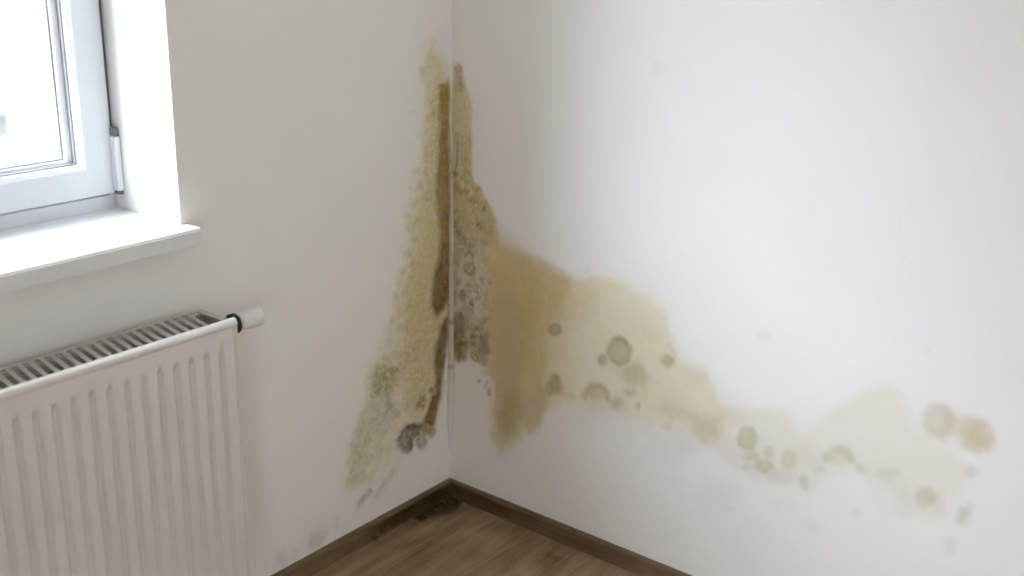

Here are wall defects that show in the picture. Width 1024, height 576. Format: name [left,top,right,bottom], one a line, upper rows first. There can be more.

damp [438,90,448,187]
damp [406,206,465,450]